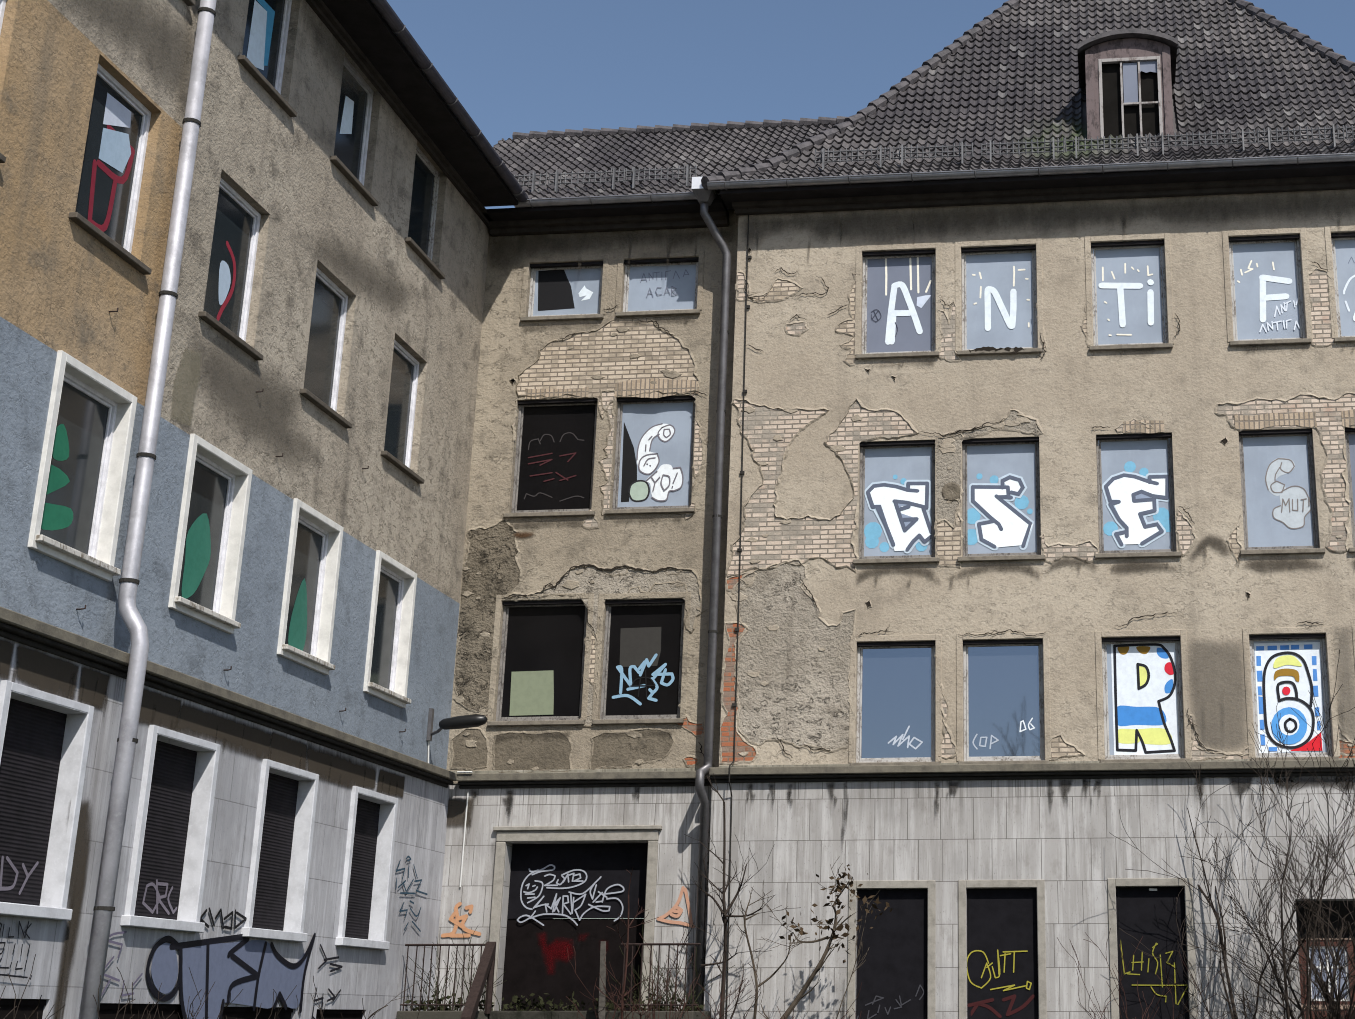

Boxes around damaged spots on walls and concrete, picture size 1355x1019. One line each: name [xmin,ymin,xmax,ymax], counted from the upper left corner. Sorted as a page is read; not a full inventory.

flaking render [735,270,804,304]
flaking render [935,300,1047,363]
flaking render [1306,267,1339,348]
spalling [934,409,1044,569]
flaking render [1214,391,1355,554]
spalling [449,316,919,773]
leakage [0,639,110,709]
leakage [139,688,405,798]
flaking render [937,680,957,760]
flaking render [1335,720,1355,758]
leakage [446,791,476,826]